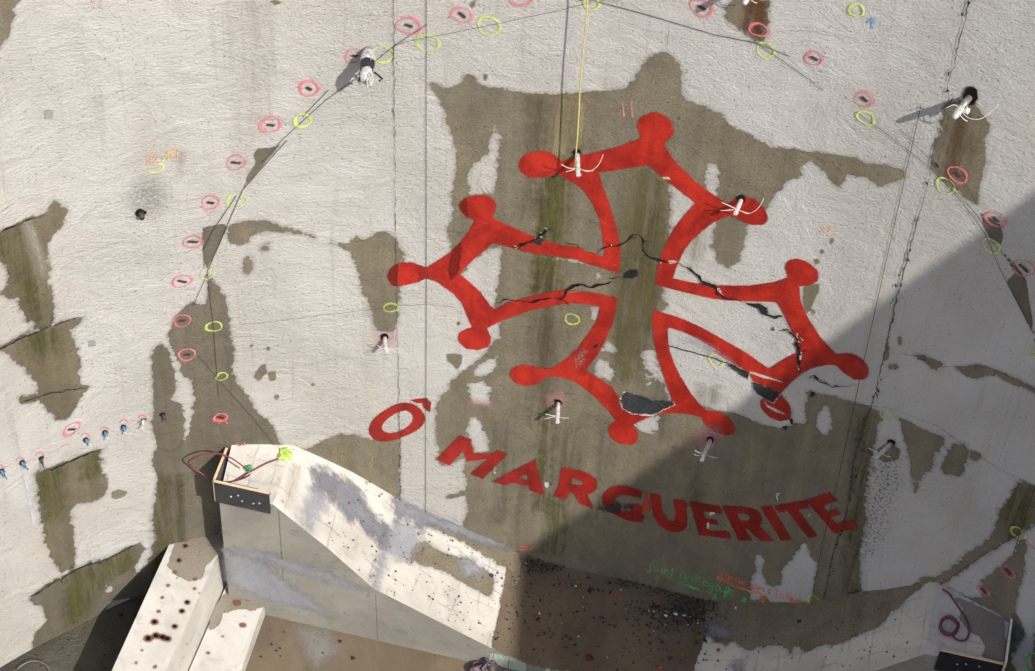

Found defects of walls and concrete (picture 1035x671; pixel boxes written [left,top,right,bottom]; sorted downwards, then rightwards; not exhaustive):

damp [244,145,279,187]
damp [242,256,253,274]
damp [203,220,315,267]
crack [515,228,746,303]
crack [502,276,619,306]
spalling [747,303,782,331]
damp [301,52,1035,671]
crack [669,346,745,373]
spalling [619,391,675,416]
spalling [726,365,795,431]
crack [780,317,1026,482]
damp [30,278,365,649]